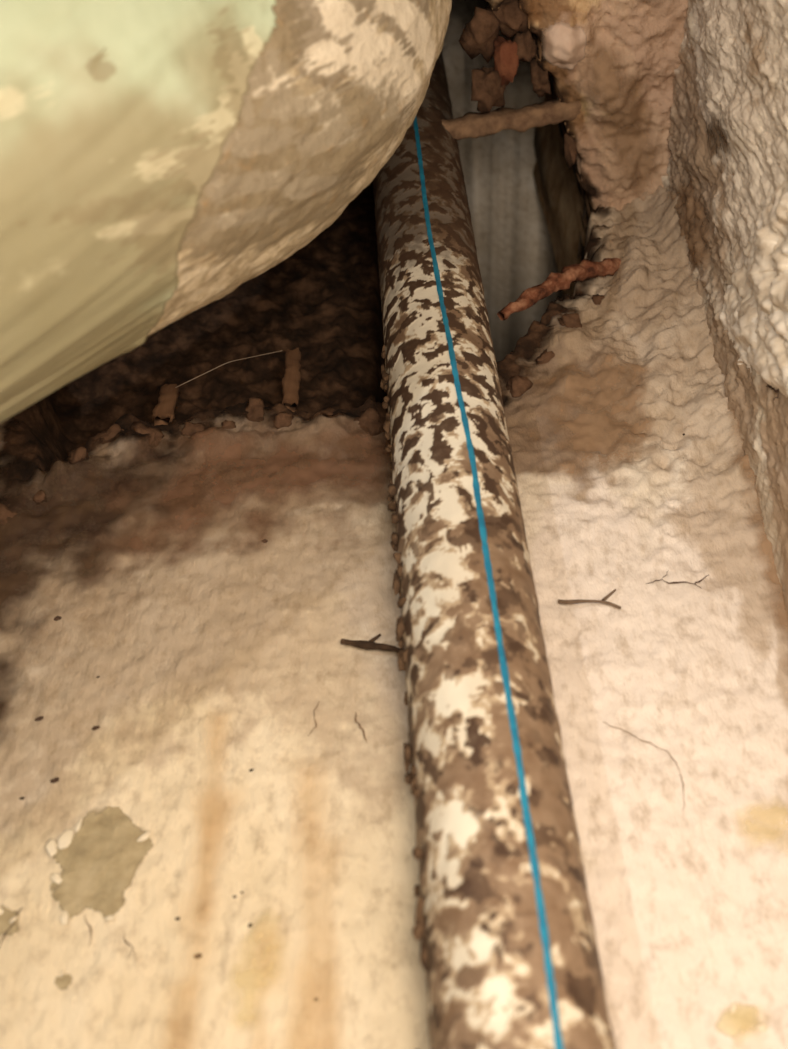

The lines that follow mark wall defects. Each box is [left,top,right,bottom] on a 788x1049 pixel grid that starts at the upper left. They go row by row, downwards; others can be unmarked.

peeling [45,806,153,926]